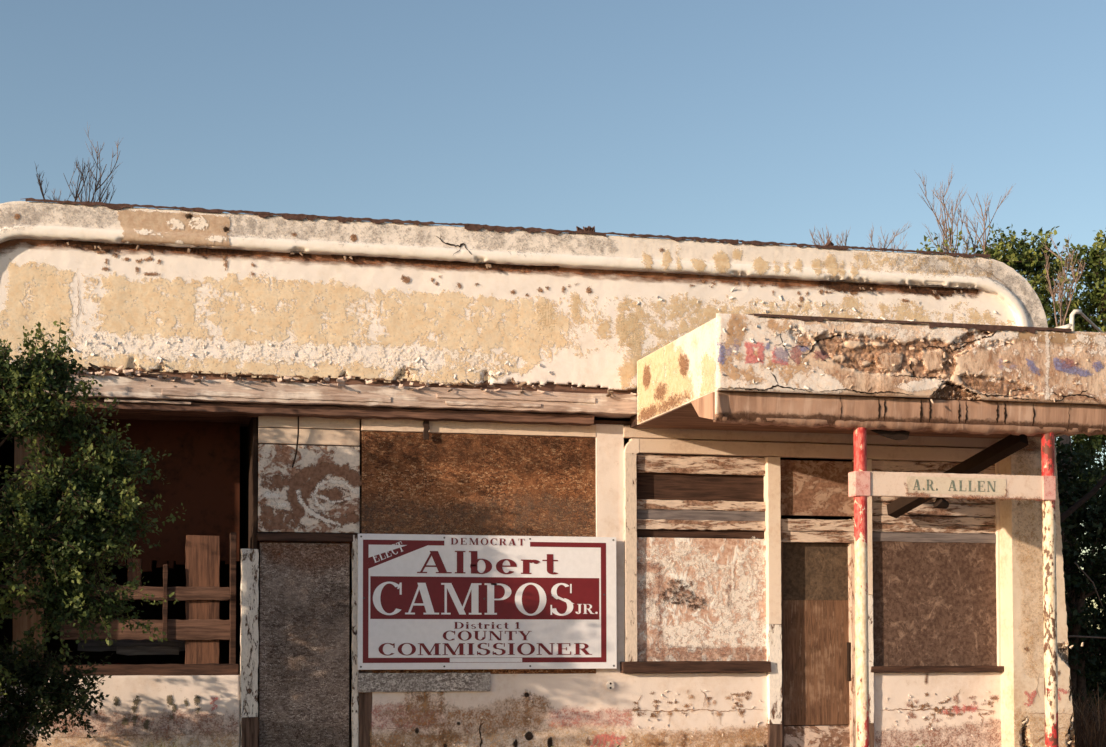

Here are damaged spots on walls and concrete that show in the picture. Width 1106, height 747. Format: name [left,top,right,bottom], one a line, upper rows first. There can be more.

peeling [0,209,1106,422]
crack [719,332,1099,402]
peeling [259,462,362,532]
spalling [1057,642,1084,668]
crack [1021,676,1073,747]